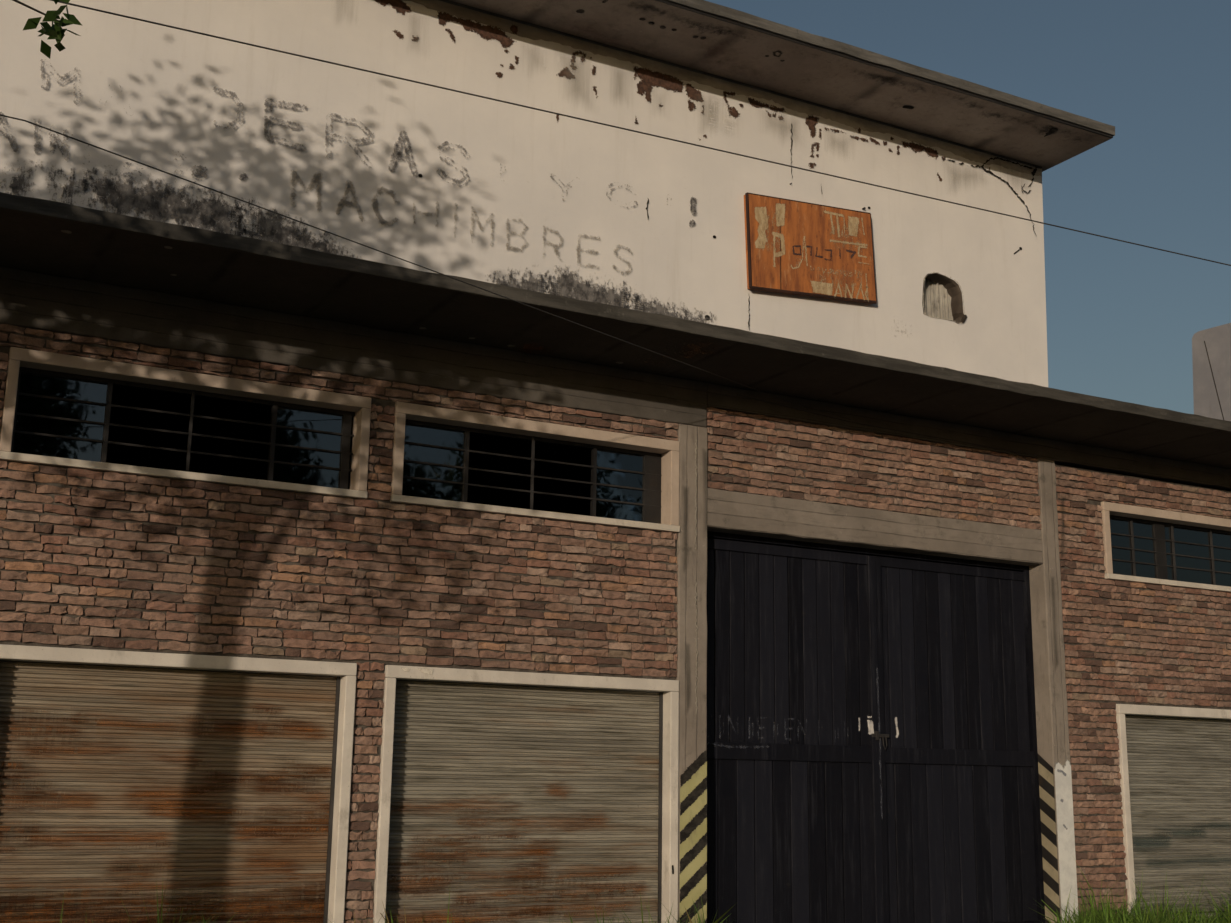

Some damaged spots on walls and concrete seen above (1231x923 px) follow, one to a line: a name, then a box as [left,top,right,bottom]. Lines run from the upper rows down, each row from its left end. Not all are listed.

peeling [375,0,411,15]
peeling [437,11,519,78]
peeling [558,50,597,98]
peeling [633,66,705,115]
peeling [723,91,786,120]
damp [1,164,358,258]
crack [947,157,1039,232]
damp [487,266,714,324]
corrosion [131,765,330,841]
corrosion [0,826,167,846]
corrosion [0,858,325,923]
corrosion [385,836,645,923]